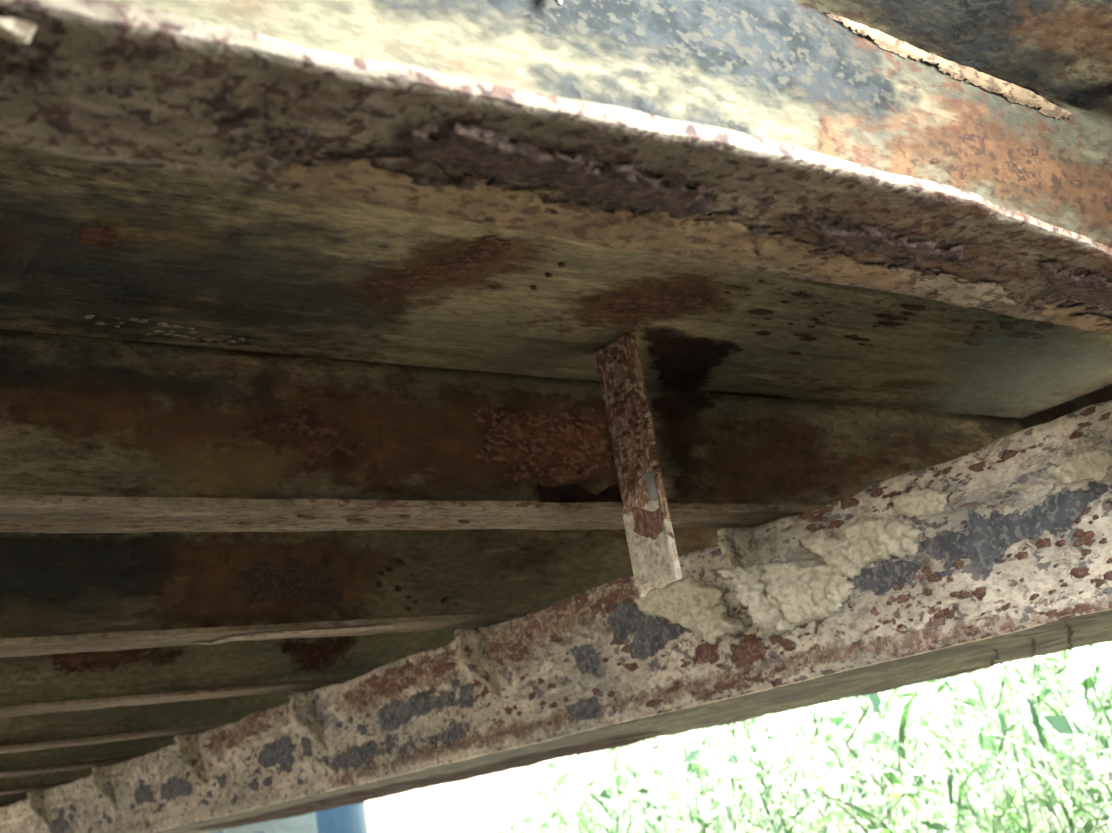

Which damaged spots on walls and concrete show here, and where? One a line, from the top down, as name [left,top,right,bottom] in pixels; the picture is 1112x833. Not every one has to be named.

corrosion [391,122,743,220]
corrosion [335,234,554,319]
peeling [277,149,1112,334]
corrosion [748,293,832,355]
corrosion [783,212,972,281]
corrosion [845,304,927,346]
corrosion [951,258,1112,348]
corrosion [566,273,765,486]
corrosion [50,646,185,675]
corrosion [187,506,1112,831]
peeling [129,679,474,814]
peeling [43,794,117,833]